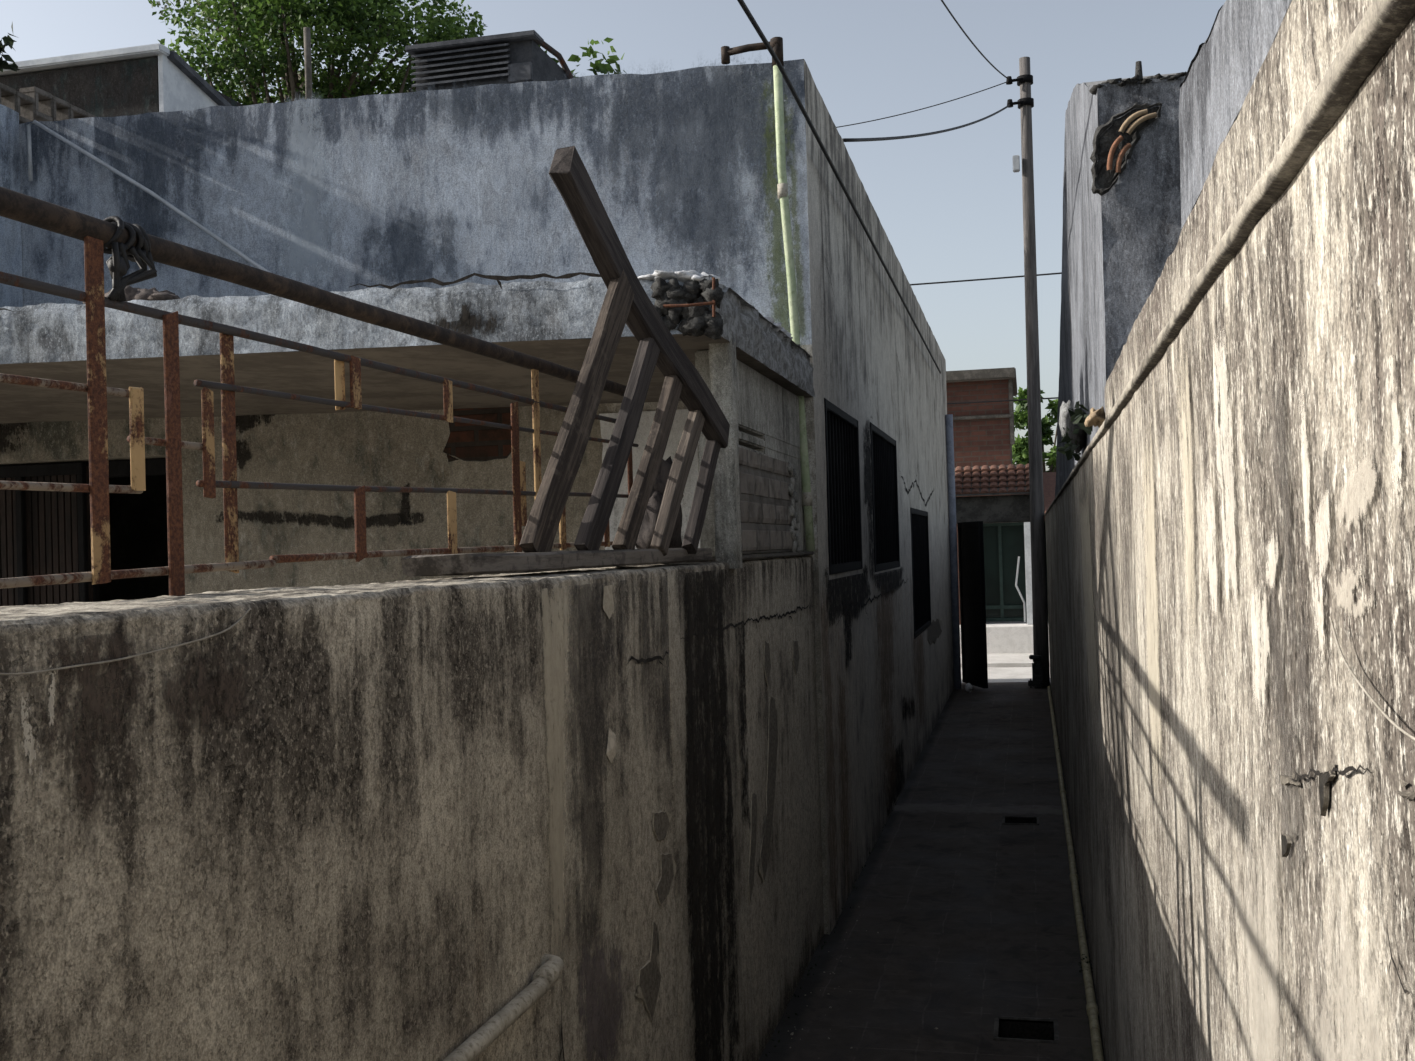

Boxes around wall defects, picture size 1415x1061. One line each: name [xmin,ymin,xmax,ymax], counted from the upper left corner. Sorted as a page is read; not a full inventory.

leakage [430,303,505,336]
crack [350,272,601,289]
leakage [1142,435,1161,789]
leakage [1177,333,1278,714]
leakage [1297,388,1330,674]
leakage [1388,355,1403,505]
leakage [21,632,141,806]
peeling [636,811,676,1022]
leakage [685,569,750,1061]
leakage [1238,827,1282,1061]
crack [1283,765,1368,787]
leakage [1310,911,1415,1061]